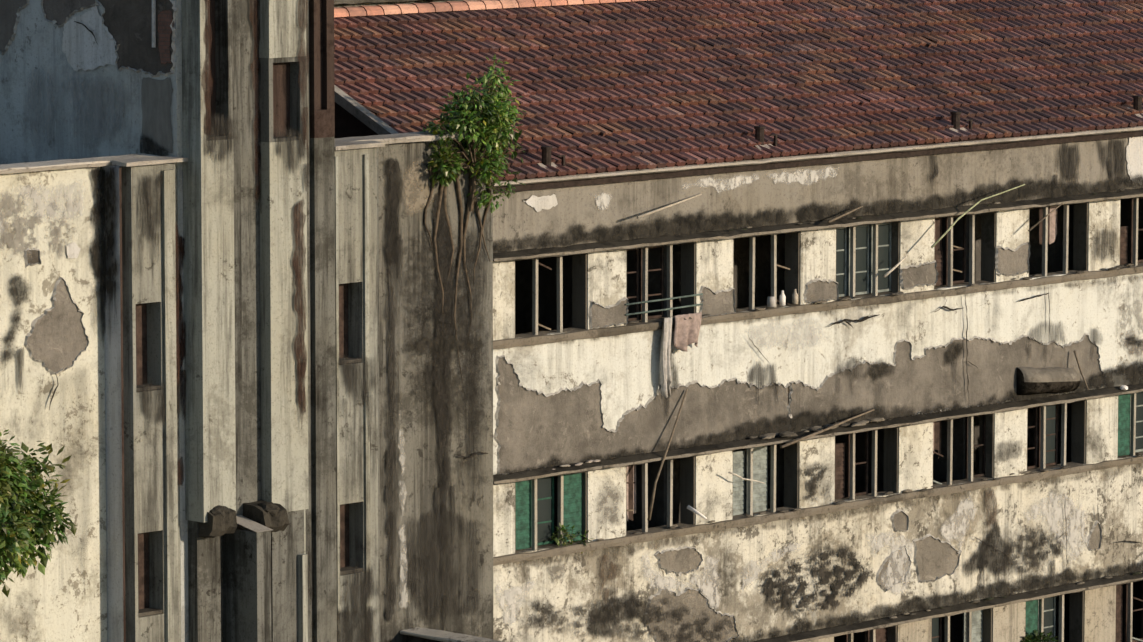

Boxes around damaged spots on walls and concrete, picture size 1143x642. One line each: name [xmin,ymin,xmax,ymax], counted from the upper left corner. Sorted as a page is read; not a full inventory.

flaking render [0,0,177,153]
damp [92,165,117,339]
peeling [523,194,558,212]
damp [493,140,1143,254]
flaking render [24,277,89,375]
damp [337,158,484,642]
flaking render [588,297,629,340]
flaking render [493,333,1103,475]
damp [582,352,1143,463]
damp [946,343,963,382]
damp [800,464,828,500]
damp [532,490,1143,642]